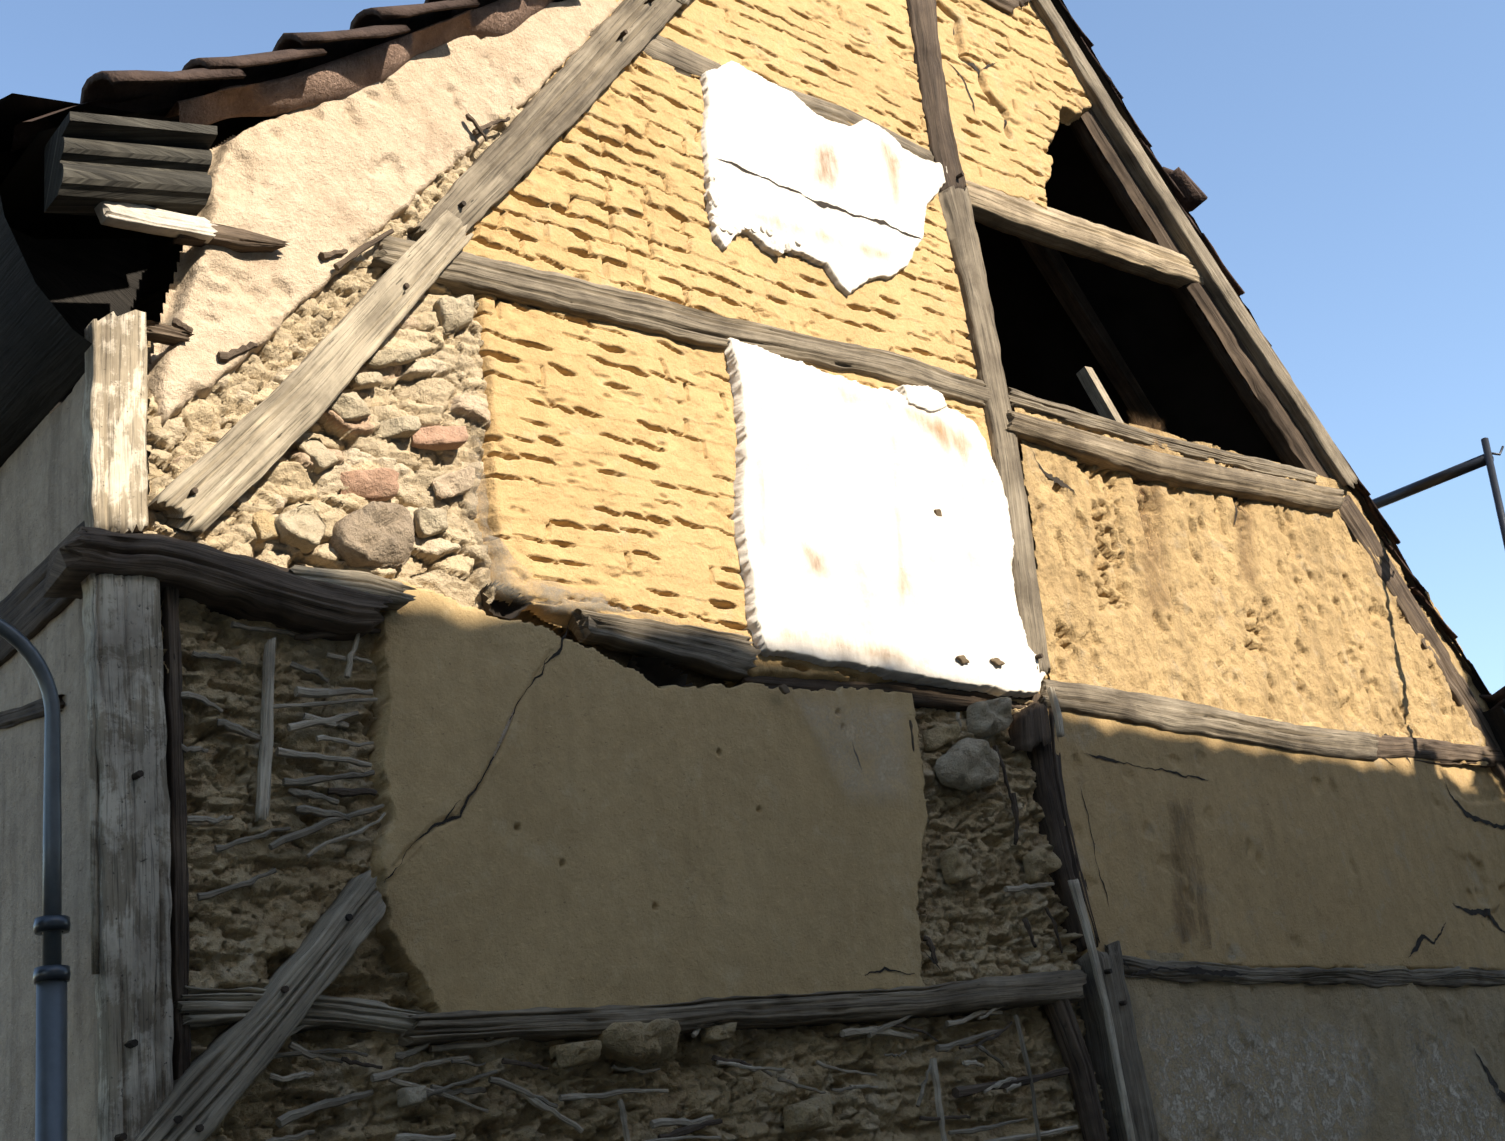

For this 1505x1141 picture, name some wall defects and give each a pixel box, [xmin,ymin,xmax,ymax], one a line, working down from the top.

crack [710,155,922,239]
spalling [143,78,551,620]
flaking render [724,338,1083,987]
spalling [160,598,386,989]
crack [384,619,570,883]
crack [1081,753,1208,906]
crack [1446,785,1505,830]
spalling [320,926,425,1011]
crack [1105,945,1248,977]
crack [1409,905,1505,957]
spalling [190,1025,229,1062]
spalling [205,1006,1084,1141]